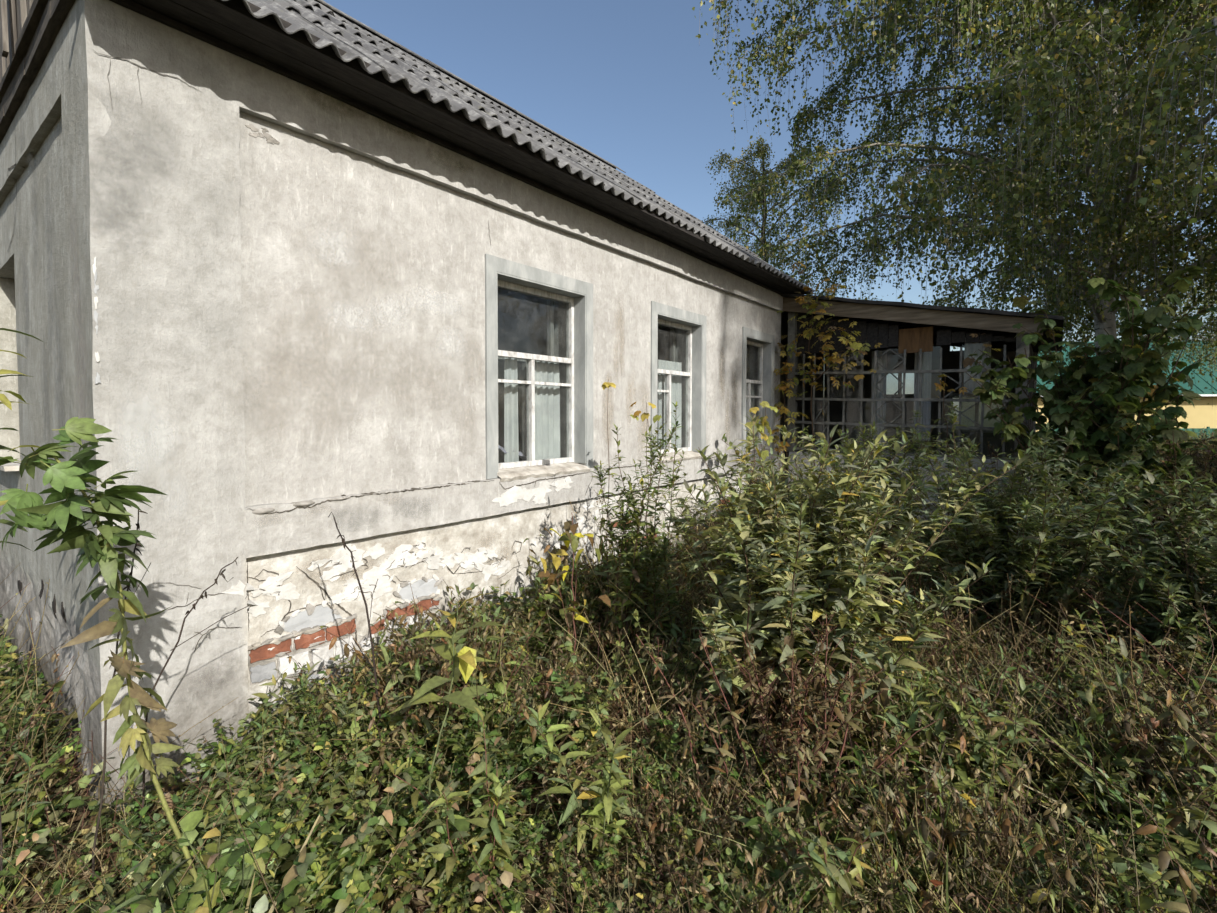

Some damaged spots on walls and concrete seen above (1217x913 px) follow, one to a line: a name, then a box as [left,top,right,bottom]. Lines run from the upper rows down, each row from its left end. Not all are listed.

crack [95,51,203,112]
peeling [492,477,573,507]
peeling [222,542,511,692]